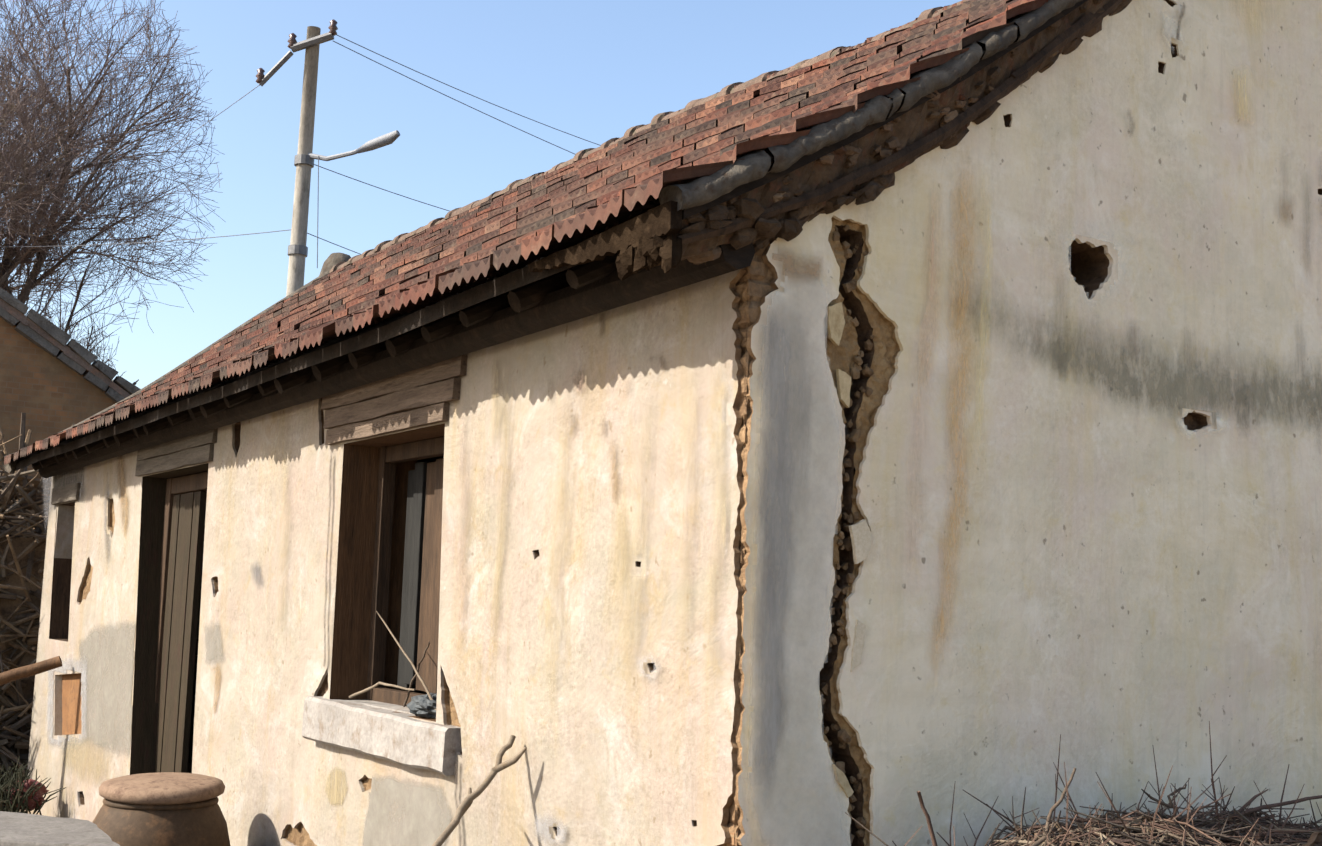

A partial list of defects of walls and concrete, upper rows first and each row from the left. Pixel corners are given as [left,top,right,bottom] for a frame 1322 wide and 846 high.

damp [1036,338,1322,417]
spalling [1181,411,1223,432]
spalling [107,498,115,538]
crack [818,215,903,846]
spalling [77,557,93,605]
peeling [326,770,372,804]
spalling [281,822,317,846]
peeling [536,819,564,841]